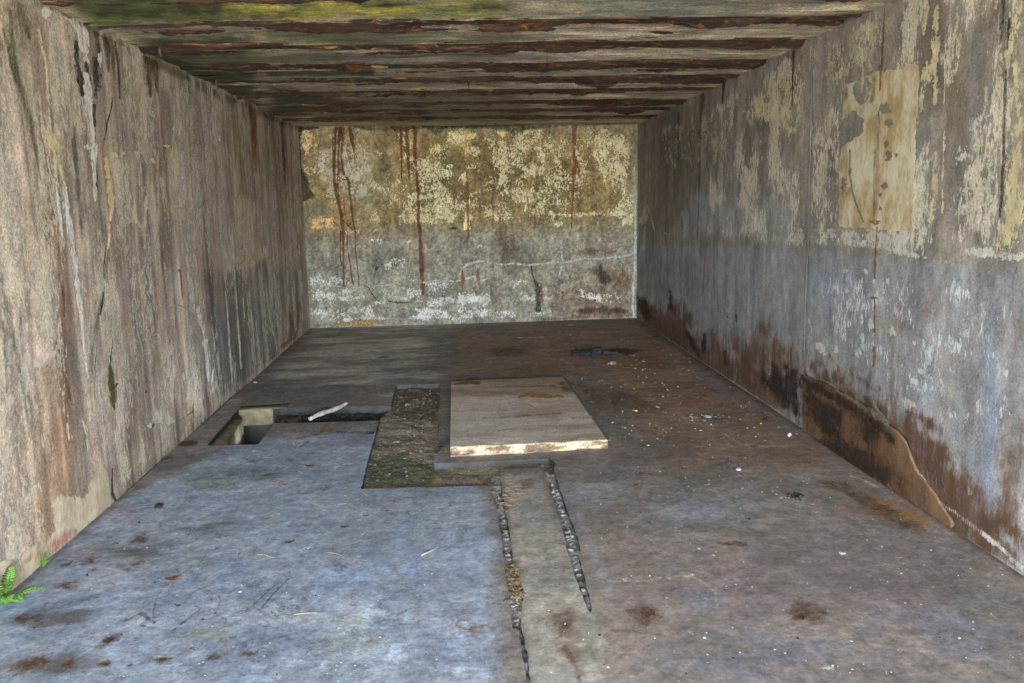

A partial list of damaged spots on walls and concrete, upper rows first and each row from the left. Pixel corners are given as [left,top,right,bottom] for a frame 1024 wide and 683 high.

rust [332,126,360,289]
rust [392,126,425,295]
water stain [423,165,637,318]
peeling [395,128,672,235]
rust [571,125,580,228]
rust [574,81,619,108]
peeling [661,63,806,172]
peeling [775,108,948,263]
peeling [917,4,946,118]
peeling [927,1,1024,262]
water stain [848,475,930,525]
water stain [940,501,1024,573]